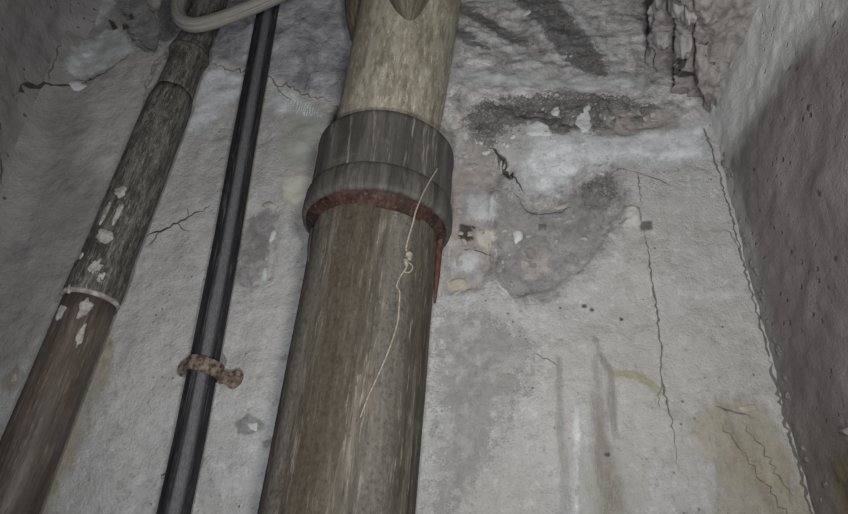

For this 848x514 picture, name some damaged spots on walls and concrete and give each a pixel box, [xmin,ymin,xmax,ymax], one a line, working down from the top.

crack [18,42,132,93]
peeling [443,90,708,326]
crack [611,168,686,205]
crack [644,232,679,468]
water stain [698,400,807,514]
crack [703,128,833,514]